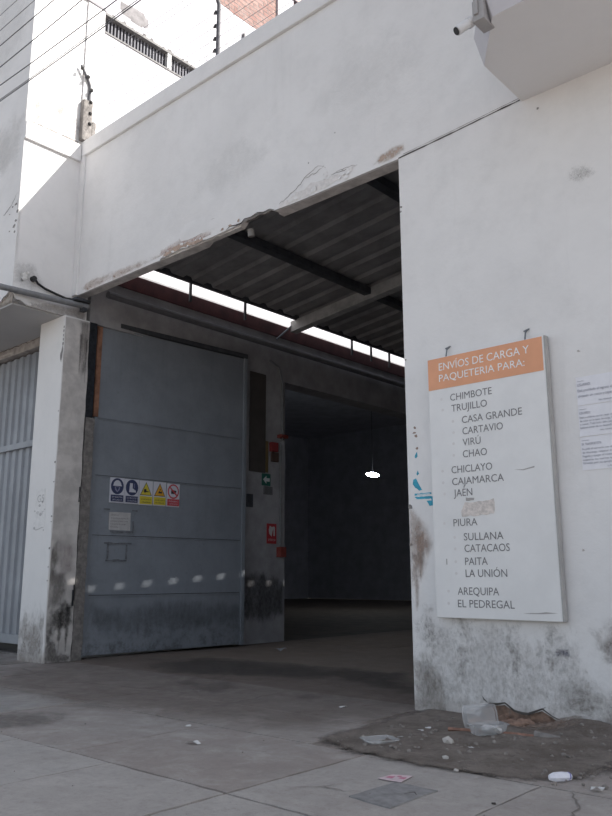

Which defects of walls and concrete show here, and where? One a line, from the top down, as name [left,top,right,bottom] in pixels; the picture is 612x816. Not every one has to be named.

flaking render [220,0,277,29]
peeling [221,166,352,231]
water stain [413,522,429,564]
water stain [51,549,64,603]
water stain [18,607,69,663]
spalling [468,704,577,738]